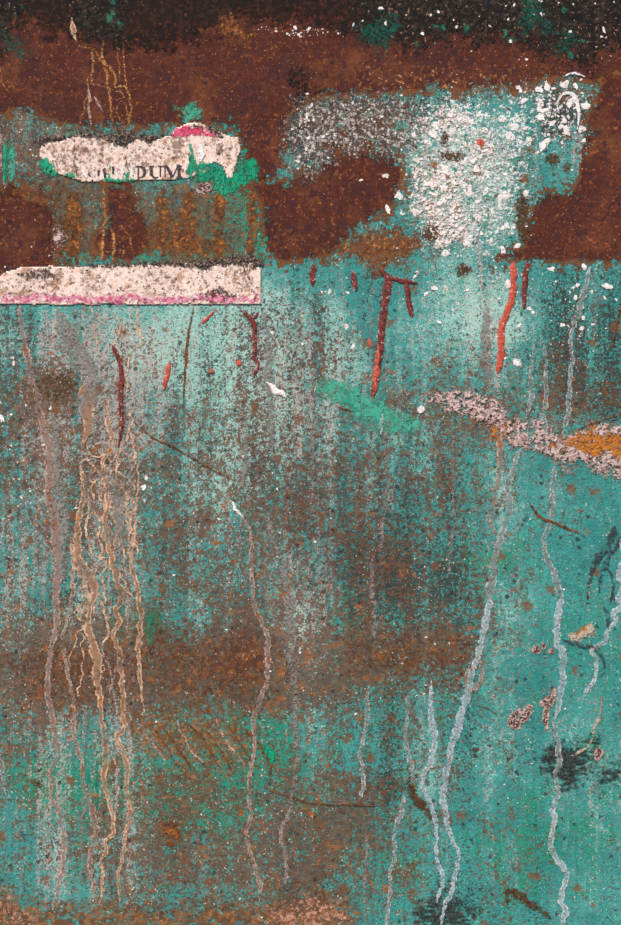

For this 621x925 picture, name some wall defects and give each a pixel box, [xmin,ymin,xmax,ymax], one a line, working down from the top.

leakage [100,181,134,262]
rust [0,0,621,280]
leakage [5,266,145,910]
rust [0,619,284,783]
rust [336,618,483,688]
rust [0,878,362,925]